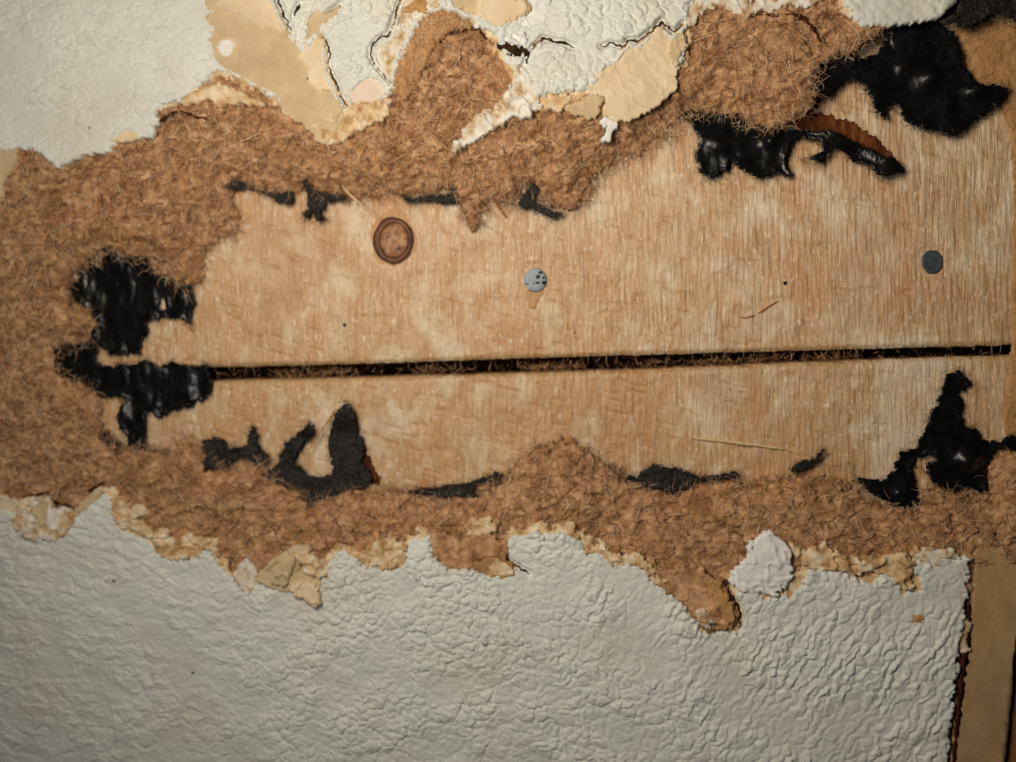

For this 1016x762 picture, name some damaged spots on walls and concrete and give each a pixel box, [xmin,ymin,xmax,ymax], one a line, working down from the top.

peeling [181,0,396,152]
crack [277,0,307,32]
crack [322,37,348,106]
crack [370,0,401,83]
peeling [370,0,689,159]
crack [525,37,575,64]
crack [602,21,681,48]
peeling [0,486,214,562]
peeling [464,513,505,536]
spalling [231,530,408,608]
spalling [584,544,668,587]
spalling [788,535,962,594]